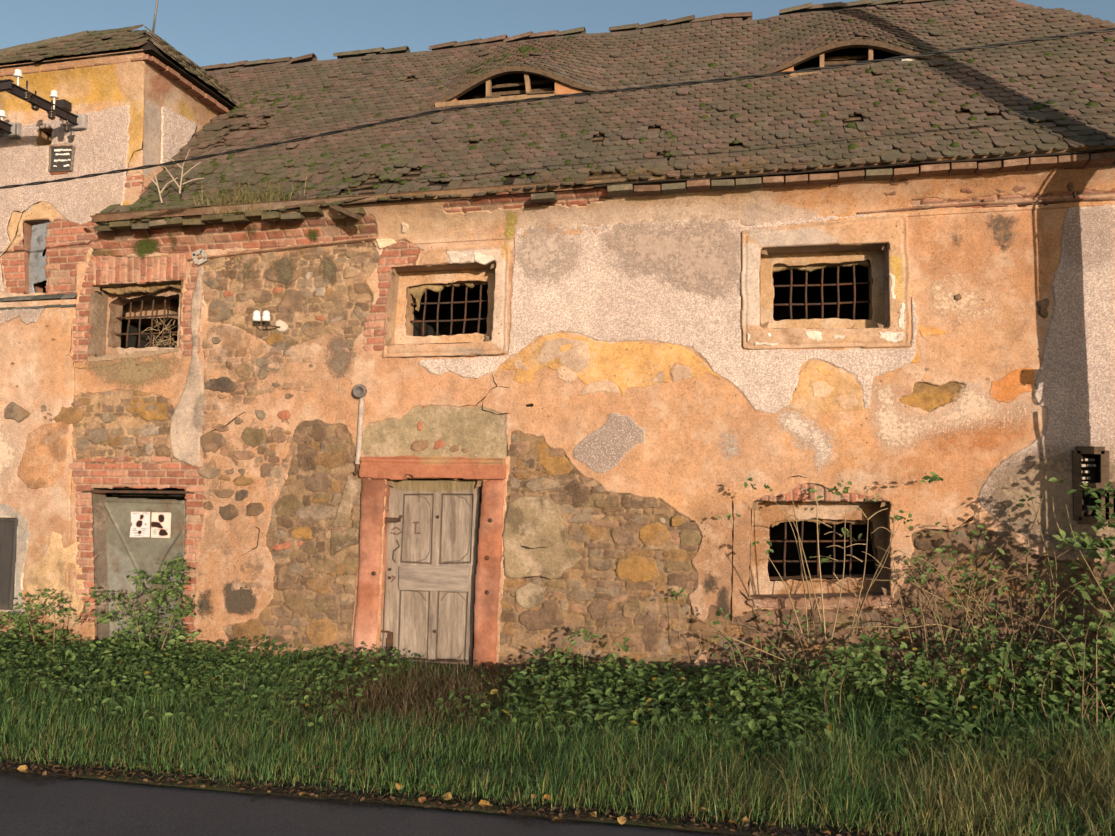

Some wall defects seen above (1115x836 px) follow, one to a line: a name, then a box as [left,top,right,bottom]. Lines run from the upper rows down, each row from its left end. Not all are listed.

flaking render [45,215,424,363]
peeling [447,251,494,265]
spalling [772,260,869,273]
mould [987,215,1015,249]
peeling [805,331,845,342]
flaking render [880,273,966,412]
flaking render [204,377,237,393]
peeling [495,334,722,407]
peeling [784,361,864,415]
peeling [972,367,1034,403]
flaking render [4,381,238,652]
flaking render [222,405,1115,685]